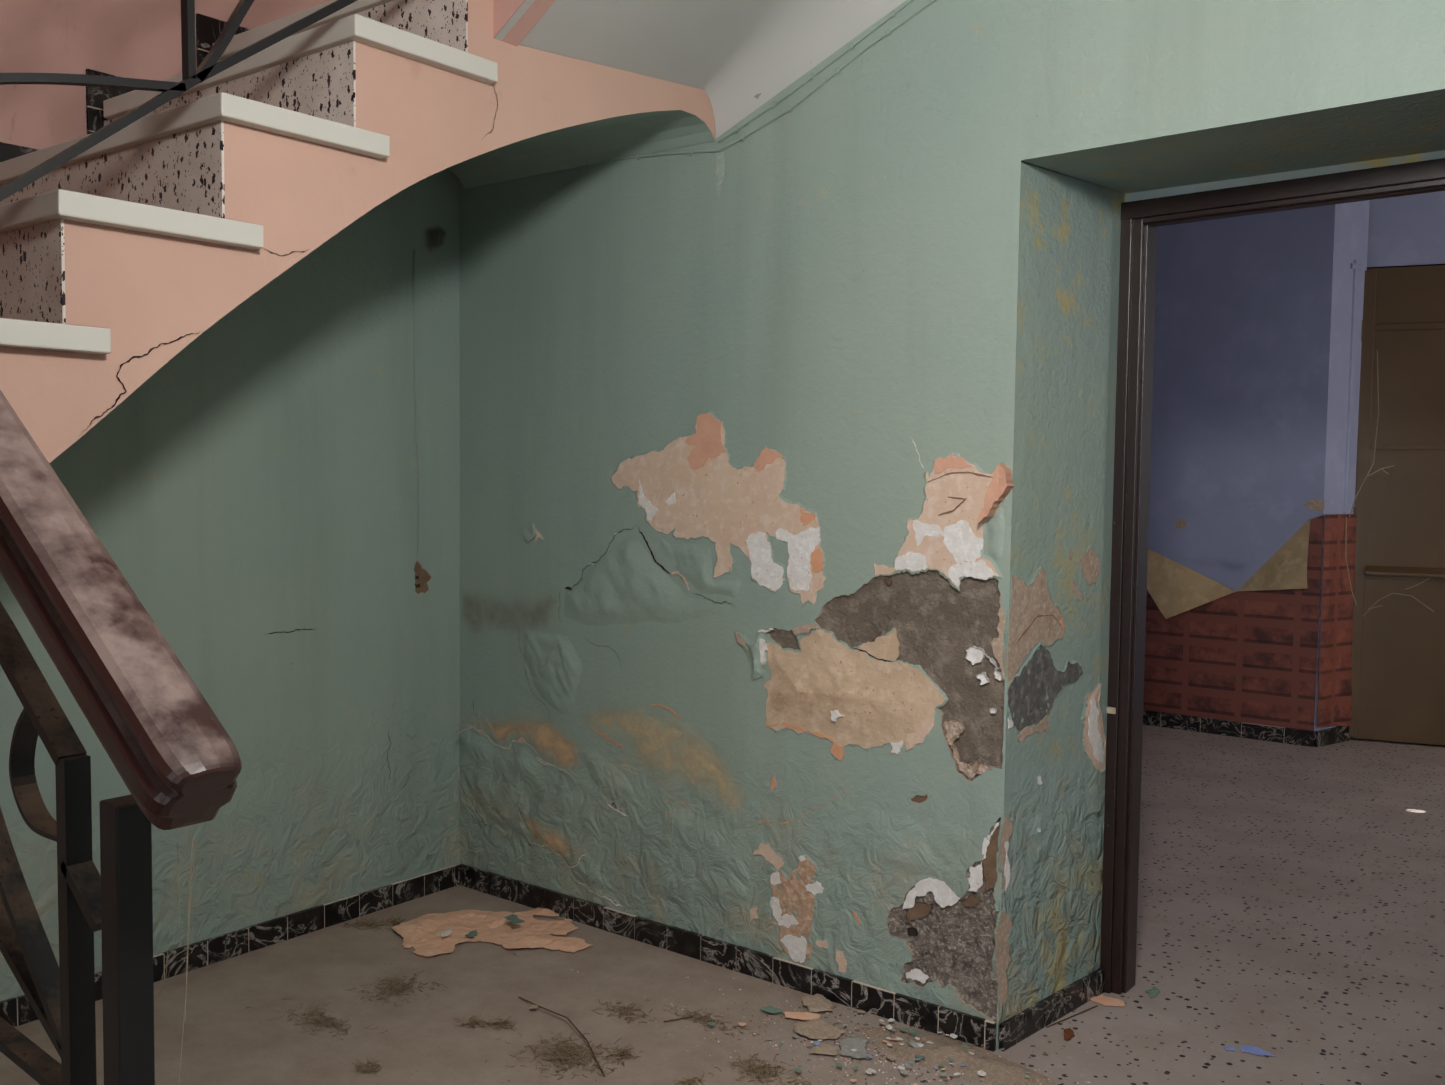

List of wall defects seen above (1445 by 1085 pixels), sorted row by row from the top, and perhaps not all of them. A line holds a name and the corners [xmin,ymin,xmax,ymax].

crack [82,331,206,432]
crack [558,525,732,666]
peeling [610,410,1106,782]
peeling [748,841,847,974]
flaking render [886,814,1014,1022]